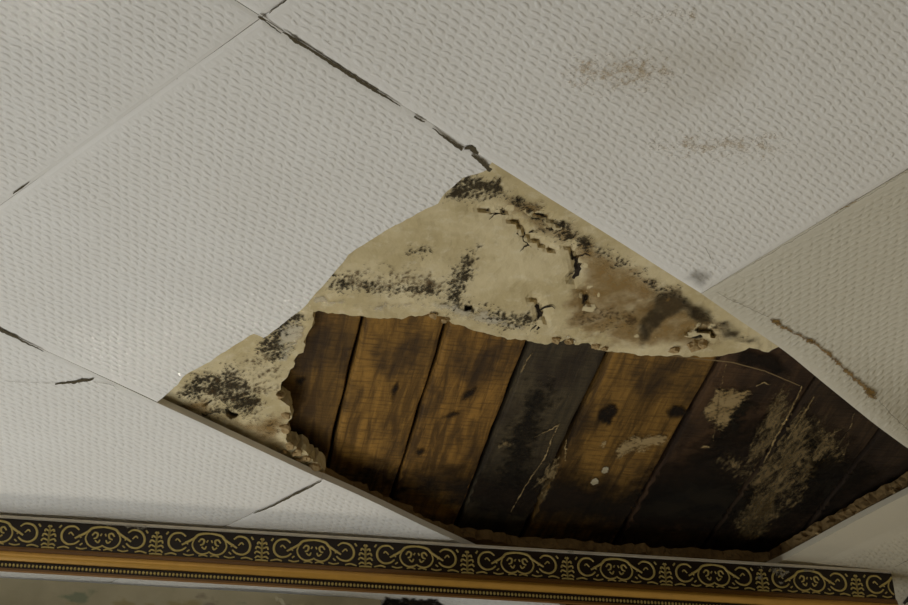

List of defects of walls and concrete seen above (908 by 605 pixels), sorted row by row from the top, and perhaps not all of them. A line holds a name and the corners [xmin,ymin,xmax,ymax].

leakage [329,246,538,334]
crack [486,209,538,250]
crack [567,251,590,279]
leakage [444,174,782,374]
spalling [163,163,908,584]
rust [724,296,877,399]
leakage [360,381,878,542]